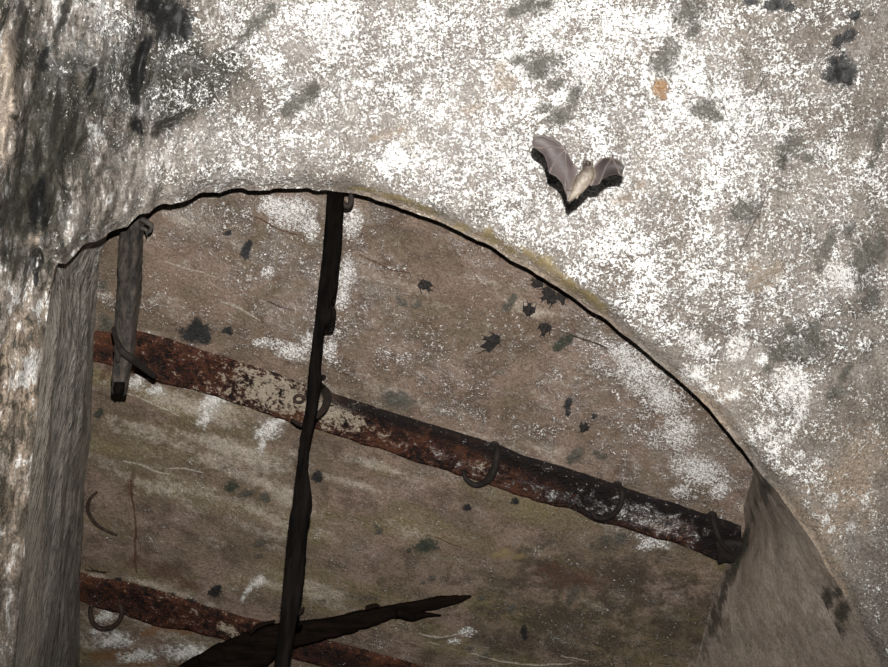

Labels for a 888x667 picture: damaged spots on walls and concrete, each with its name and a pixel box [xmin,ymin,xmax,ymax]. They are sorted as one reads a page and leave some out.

leakage [134,0,195,43]
leakage [821,10,861,89]
corrosion [651,78,669,101]
crack [244,213,298,235]
crack [360,254,411,274]
crack [561,331,609,350]
leakage [677,330,743,404]
leakage [608,342,733,500]